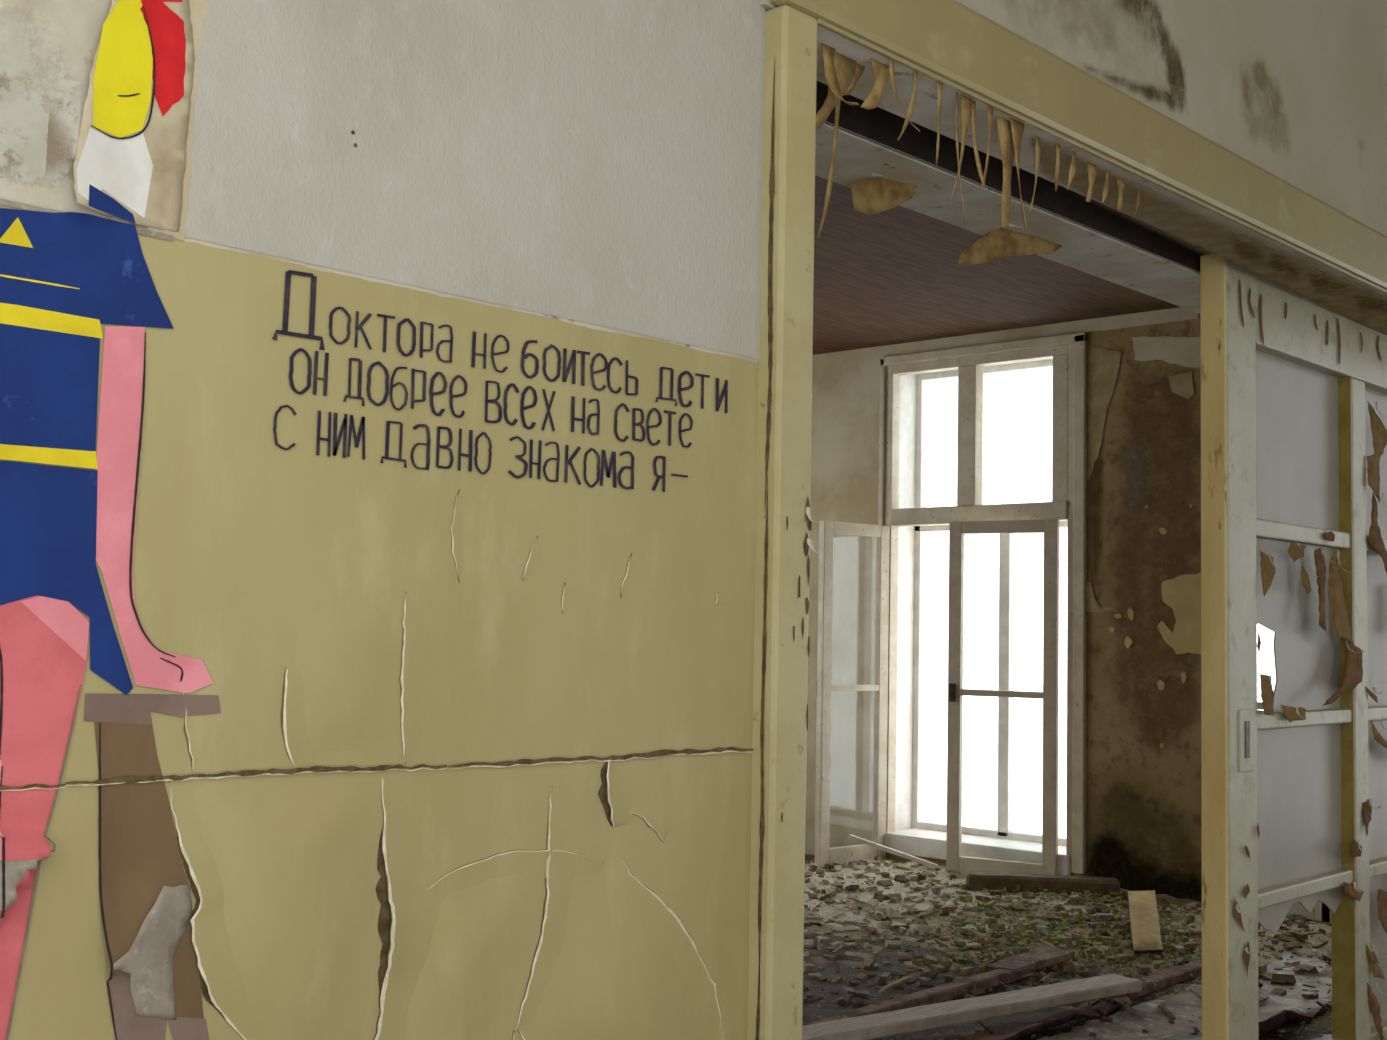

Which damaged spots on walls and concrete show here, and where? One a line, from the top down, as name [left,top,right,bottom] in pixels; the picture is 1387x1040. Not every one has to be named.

peeling [0,0,208,241]
peeling [816,43,920,238]
peeling [936,82,1140,265]
damp [1110,0,1184,107]
crack [0,62,775,1040]
peeling [1086,336,1201,483]
peeling [1157,573,1201,655]
peeling [1259,531,1382,722]
peeling [1367,401,1387,573]
peeling [0,857,49,915]
damp [1087,783,1202,902]
peeling [1343,882,1387,1040]